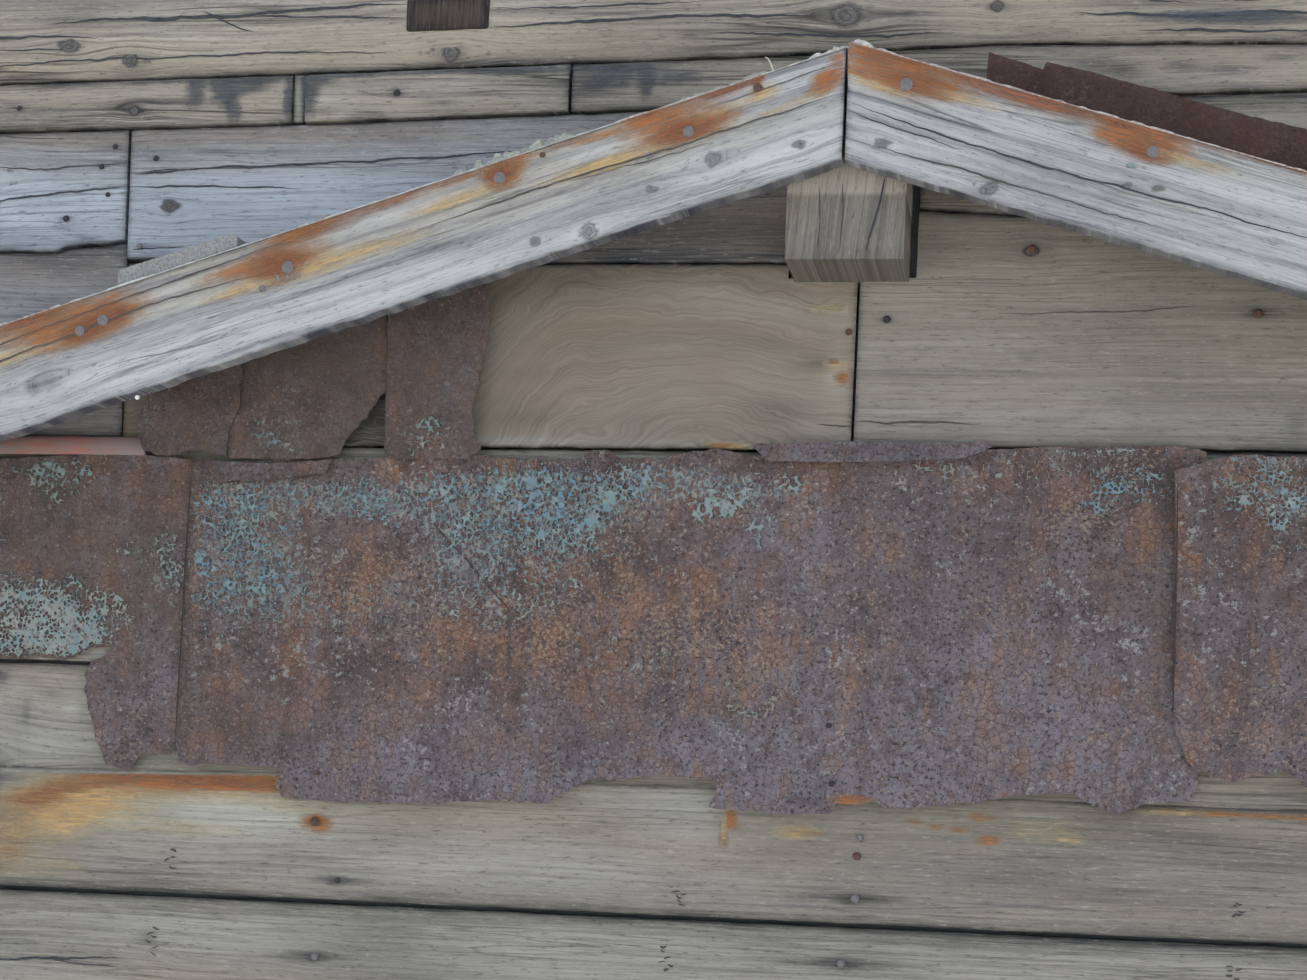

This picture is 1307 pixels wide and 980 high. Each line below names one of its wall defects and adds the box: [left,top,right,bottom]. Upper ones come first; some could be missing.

rust [555,75,774,182]
rust [806,44,1279,165]
rust [206,154,529,300]
rust [0,292,142,363]
rust [0,774,278,851]